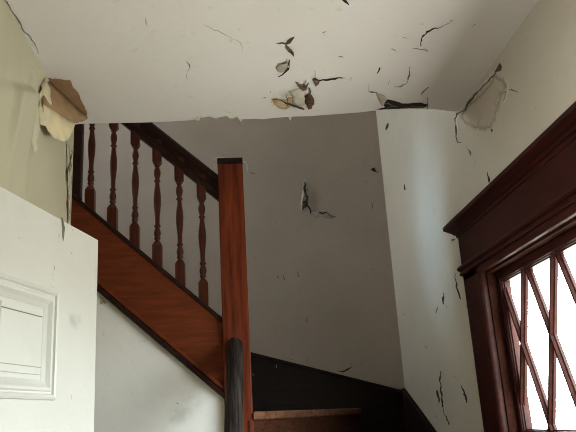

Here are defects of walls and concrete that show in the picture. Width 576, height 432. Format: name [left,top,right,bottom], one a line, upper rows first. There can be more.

crack [5,0,39,54]
peeling [276,37,294,77]
crack [403,20,452,51]
peeling [264,77,352,111]
flaking render [370,67,429,110]
flaking render [301,174,336,219]
crack [436,371,450,425]